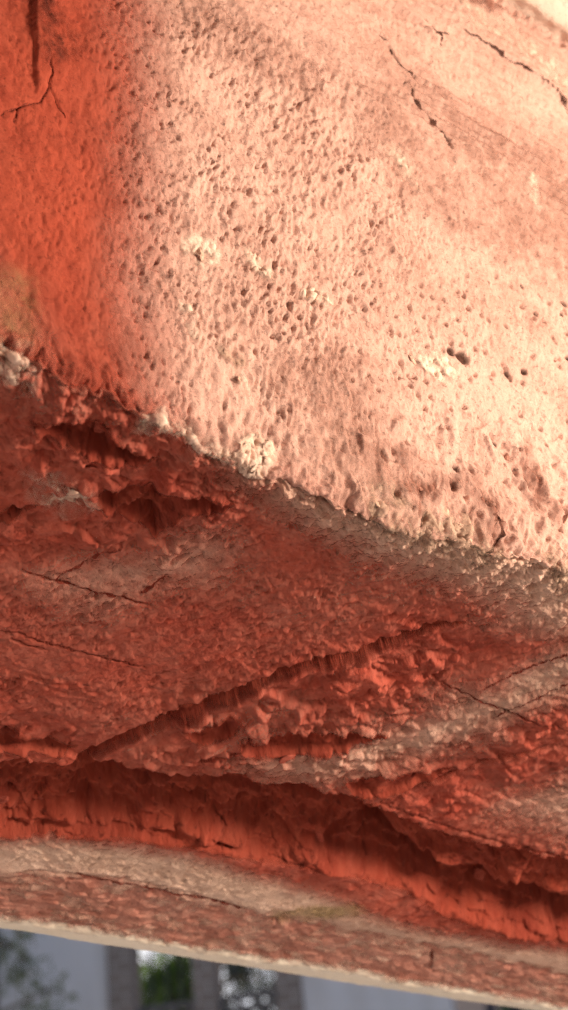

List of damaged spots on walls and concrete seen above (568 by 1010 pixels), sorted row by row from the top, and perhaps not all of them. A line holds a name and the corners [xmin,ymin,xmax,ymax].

crack [1,60,66,123]
crack [379,35,451,147]
crack [425,19,568,113]
spalling [30,418,153,469]
peeling [233,431,277,479]
spalling [89,482,236,539]
crack [28,547,163,604]
crack [424,654,568,729]
spalling [187,716,388,764]
spalling [0,725,568,943]
crack [65,871,245,909]
peeling [0,872,568,1008]